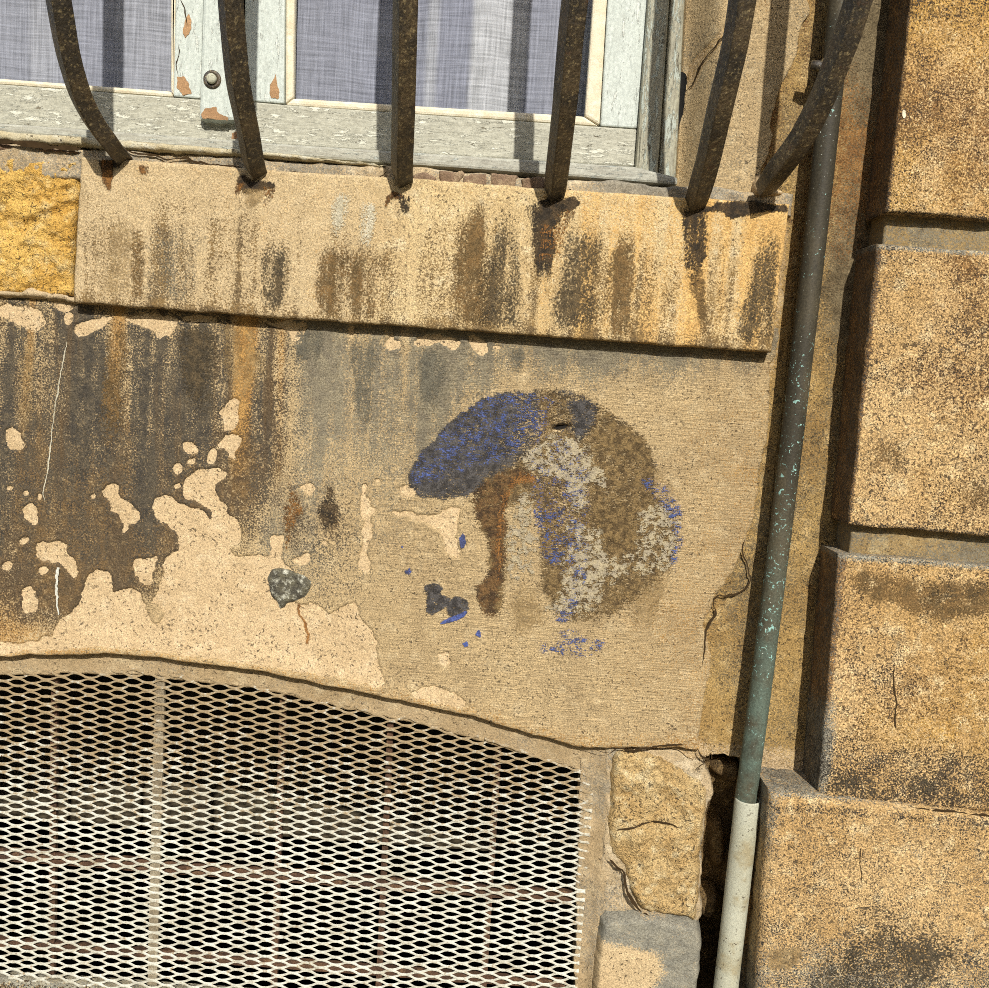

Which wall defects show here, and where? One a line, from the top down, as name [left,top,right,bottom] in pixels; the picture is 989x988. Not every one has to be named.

rust [235,175,275,205]
rust [527,196,580,283]
rust [681,200,788,333]
flaking render [53,301,112,337]
flaking render [125,313,218,339]
leakage [99,328,128,445]
leakage [177,326,219,417]
flaking render [0,398,385,688]
crack [702,540,751,664]
crack [618,821,679,830]
crack [610,860,649,916]
leakage [812,901,967,988]